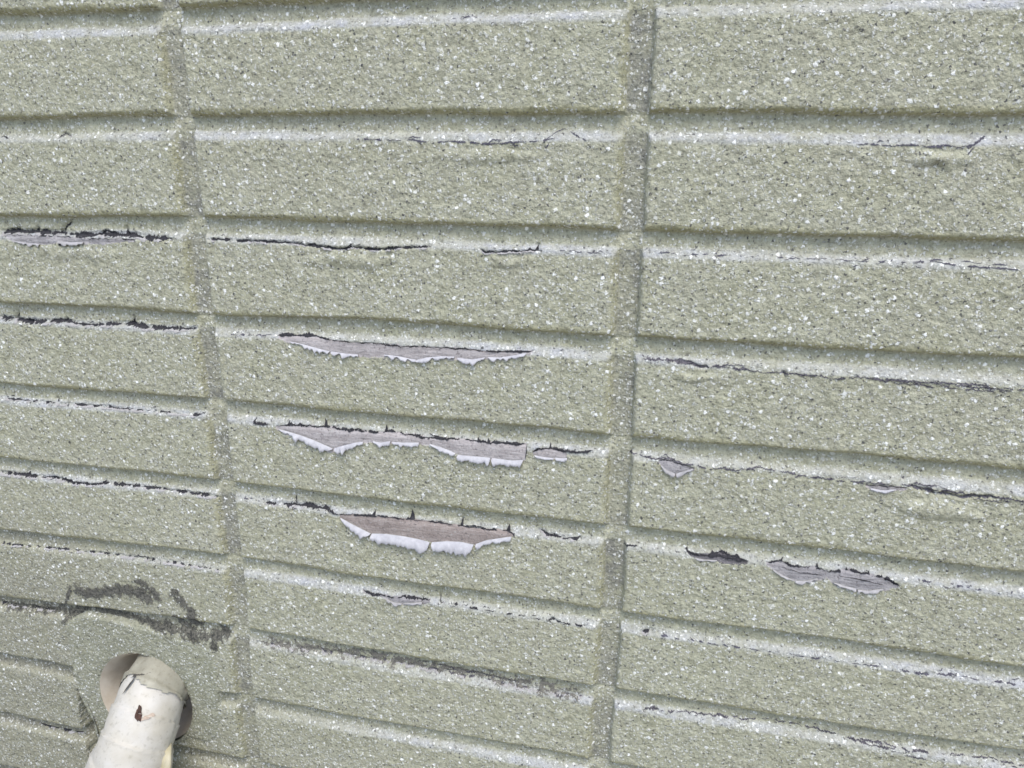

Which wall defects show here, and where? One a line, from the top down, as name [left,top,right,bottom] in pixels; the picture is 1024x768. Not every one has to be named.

crack [356,128,586,148]
peeling [5,233,135,248]
crack [211,237,431,252]
crack [0,313,196,333]
peeling [278,332,533,366]
crack [643,355,1024,394]
peeling [253,418,593,467]
crack [0,471,217,499]
crack [630,449,1024,503]
peeling [330,509,515,557]
peeling [685,547,748,566]
peeling [766,557,900,594]